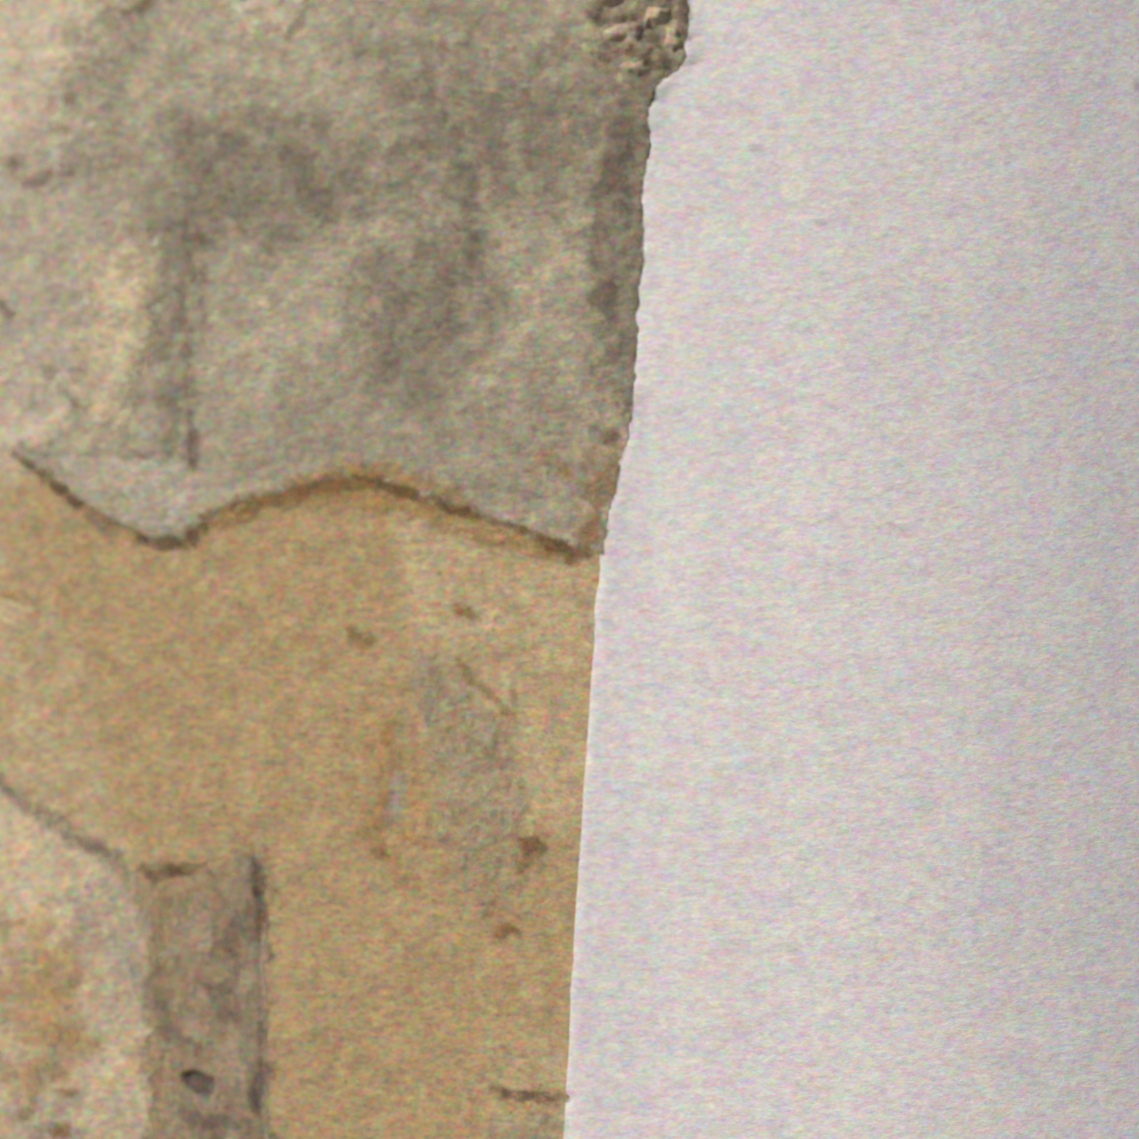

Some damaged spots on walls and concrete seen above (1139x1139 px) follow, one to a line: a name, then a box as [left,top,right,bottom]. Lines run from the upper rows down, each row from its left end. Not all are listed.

leakage [172,126,349,238]
peeling [12,0,690,554]
leakage [363,227,494,400]
leakage [387,73,653,408]